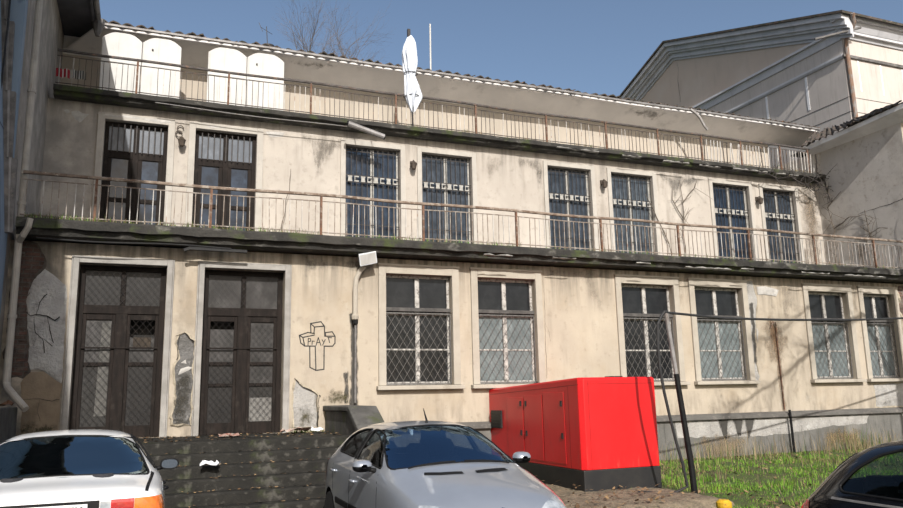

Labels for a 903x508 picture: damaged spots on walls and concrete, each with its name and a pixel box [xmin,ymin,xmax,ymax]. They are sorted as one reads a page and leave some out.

peeling [684,266,779,385]
peeling [169,331,196,428]
peeling [291,378,320,430]
peeling [675,382,903,438]